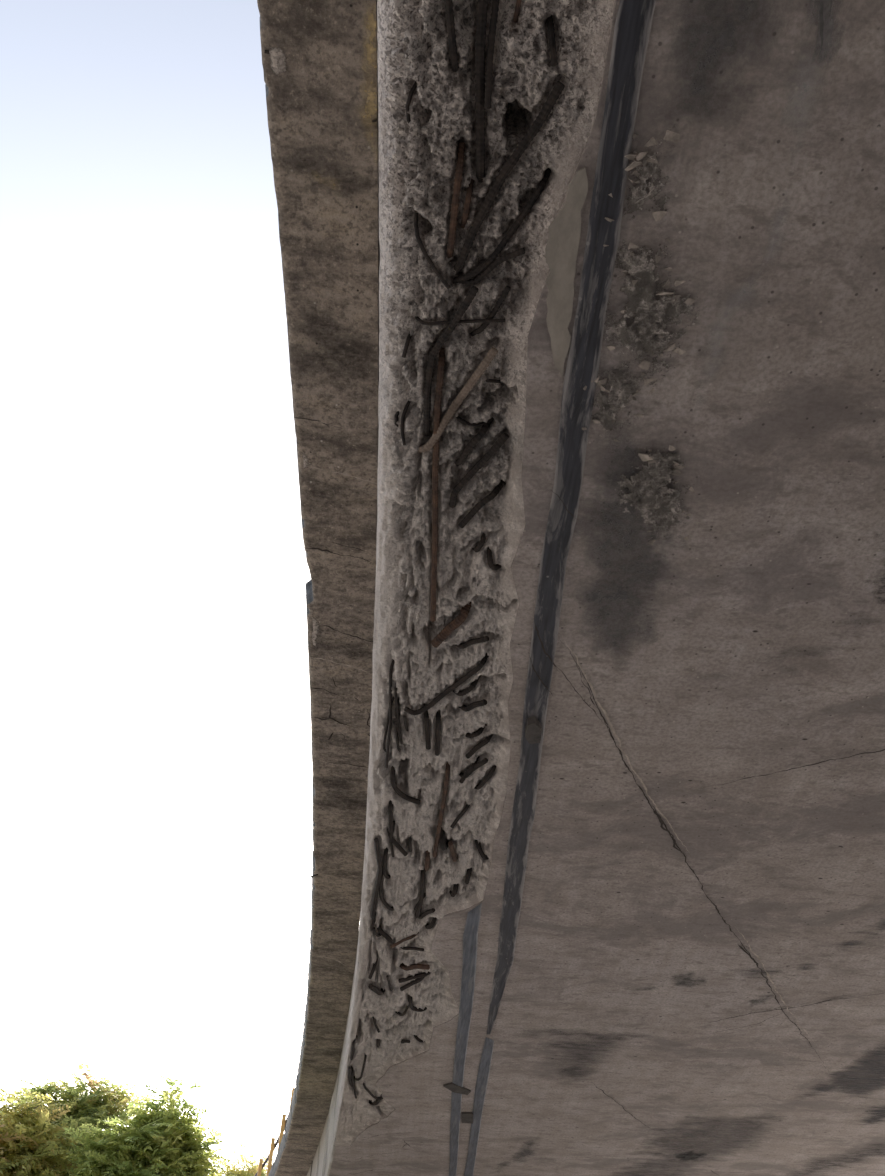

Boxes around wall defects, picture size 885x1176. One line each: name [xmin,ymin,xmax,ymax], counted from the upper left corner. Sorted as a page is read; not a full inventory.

spalling [269,47,287,73]
peeling [605,125,680,222]
peeling [582,238,700,442]
spalling [333,0,615,1146]
damp [584,446,662,651]
peeling [615,445,695,546]
crack [528,622,885,1067]
damp [867,1106,885,1124]